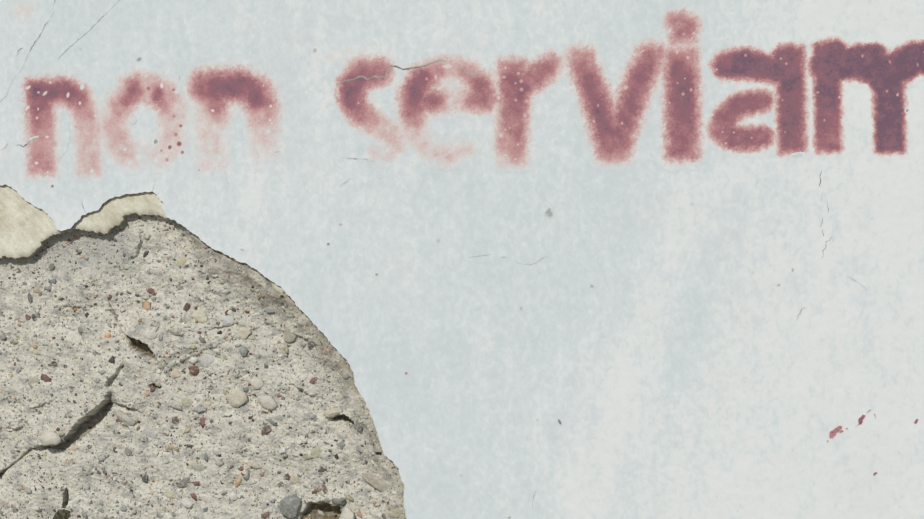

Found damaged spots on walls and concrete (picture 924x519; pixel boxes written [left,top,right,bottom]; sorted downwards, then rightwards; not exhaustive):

crack [336,60,485,85]
crack [108,298,155,359]
spalling [0,185,406,519]
crack [0,400,113,476]